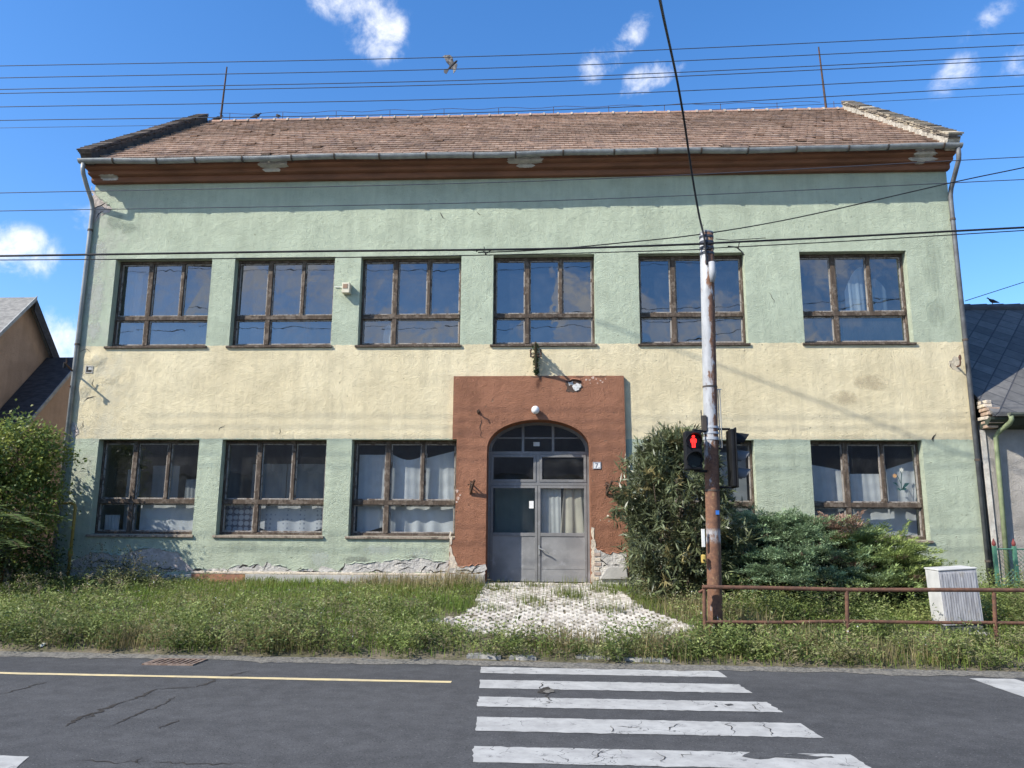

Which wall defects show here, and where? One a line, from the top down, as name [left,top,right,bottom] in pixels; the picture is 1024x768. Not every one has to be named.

spalling [71,531,487,574]
spalling [591,527,629,583]